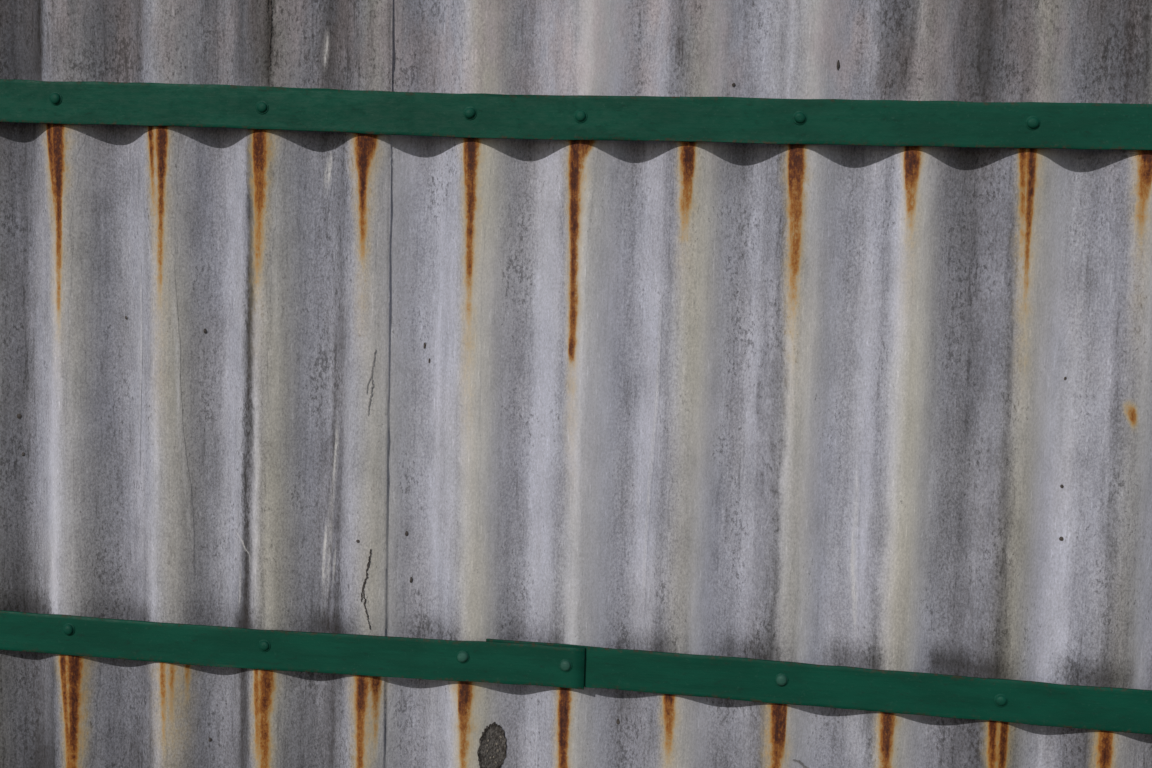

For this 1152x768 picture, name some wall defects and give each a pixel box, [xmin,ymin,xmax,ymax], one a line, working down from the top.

corrosion [36,123,88,409]
corrosion [243,129,287,404]
corrosion [342,132,394,388]
corrosion [452,137,496,540]
corrosion [556,140,602,557]
corrosion [774,144,819,451]
corrosion [51,654,104,768]
corrosion [246,669,287,768]
corrosion [341,674,397,768]
corrosion [444,680,488,768]
spalling [477,722,507,768]
corrosion [548,686,581,768]